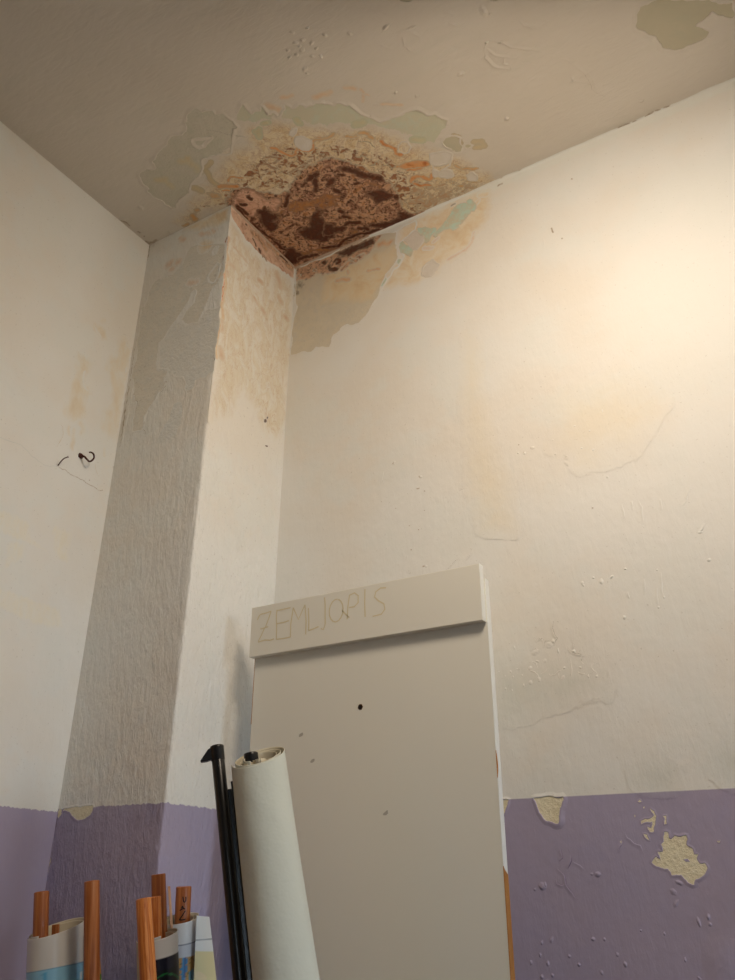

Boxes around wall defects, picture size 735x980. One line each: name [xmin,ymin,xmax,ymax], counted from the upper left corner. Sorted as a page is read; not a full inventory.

peeling [631,0,735,54]
damp [170,93,500,442]
peeling [290,199,477,357]
peeling [531,792,568,830]
peeling [634,798,711,889]